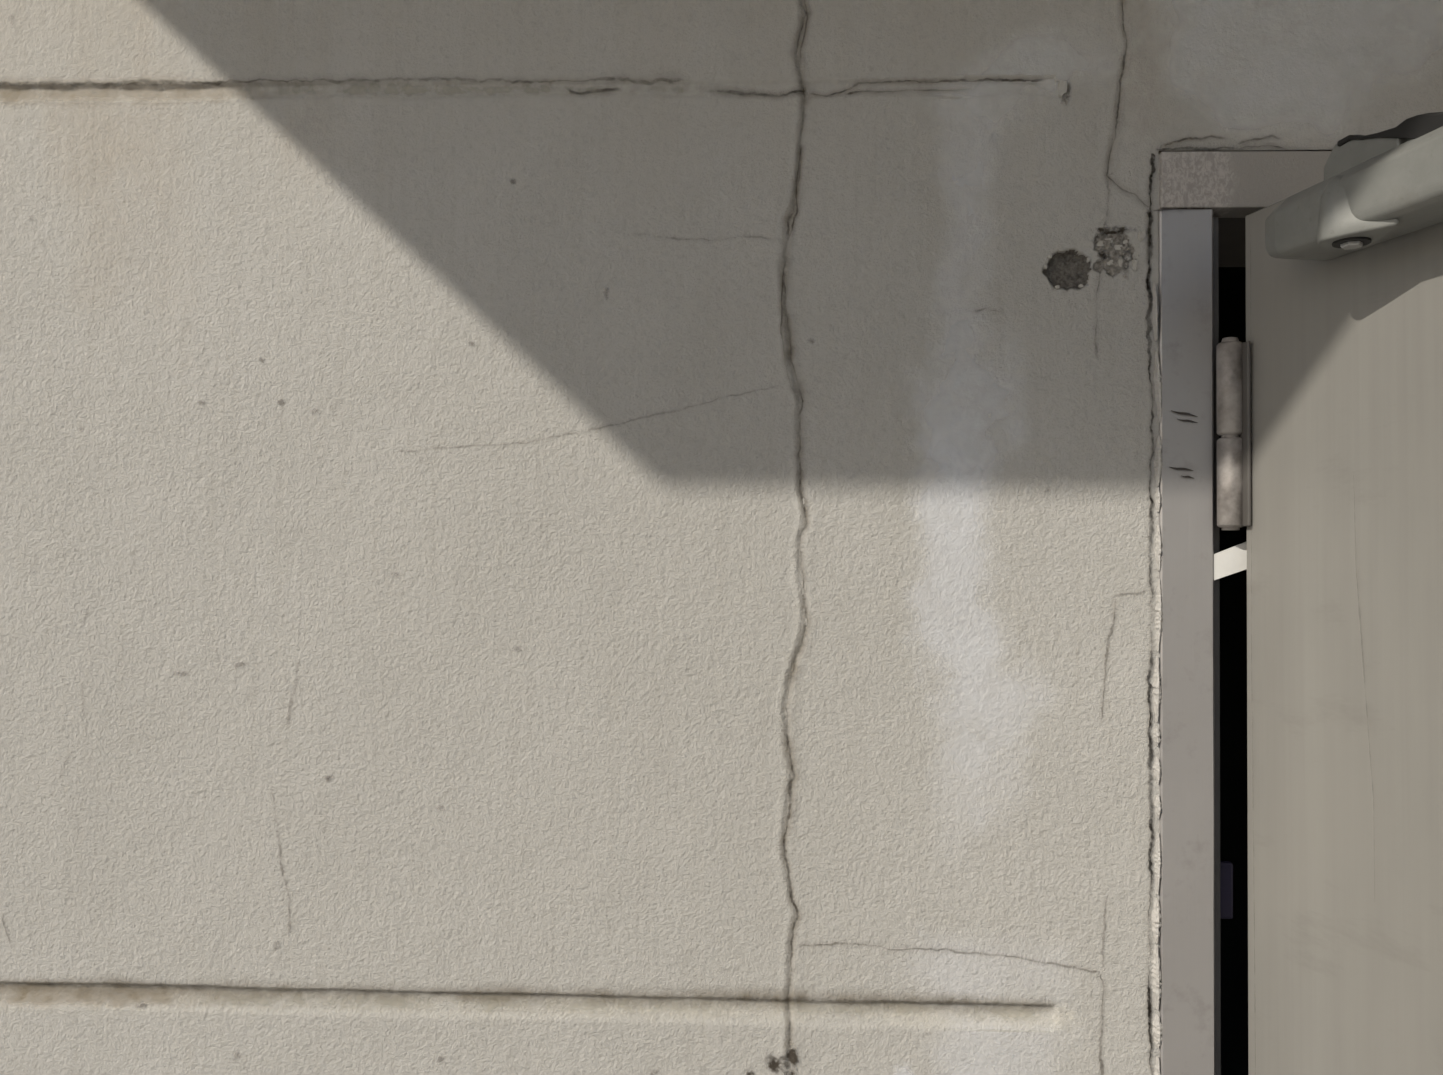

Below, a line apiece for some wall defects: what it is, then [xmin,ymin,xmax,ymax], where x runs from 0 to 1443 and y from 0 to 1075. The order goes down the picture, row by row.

crack [727,78,1038,101]
crack [781,150,806,517]
spalling [1043,226,1146,290]
crack [1106,0,1333,594]
crack [1145,640,1153,768]
peeling [1151,282,1163,1075]
crack [783,735,798,958]
crack [1147,802,1155,923]
crack [106,982,202,990]
crack [440,990,531,998]
crack [701,995,996,1065]
crack [1145,960,1153,1071]